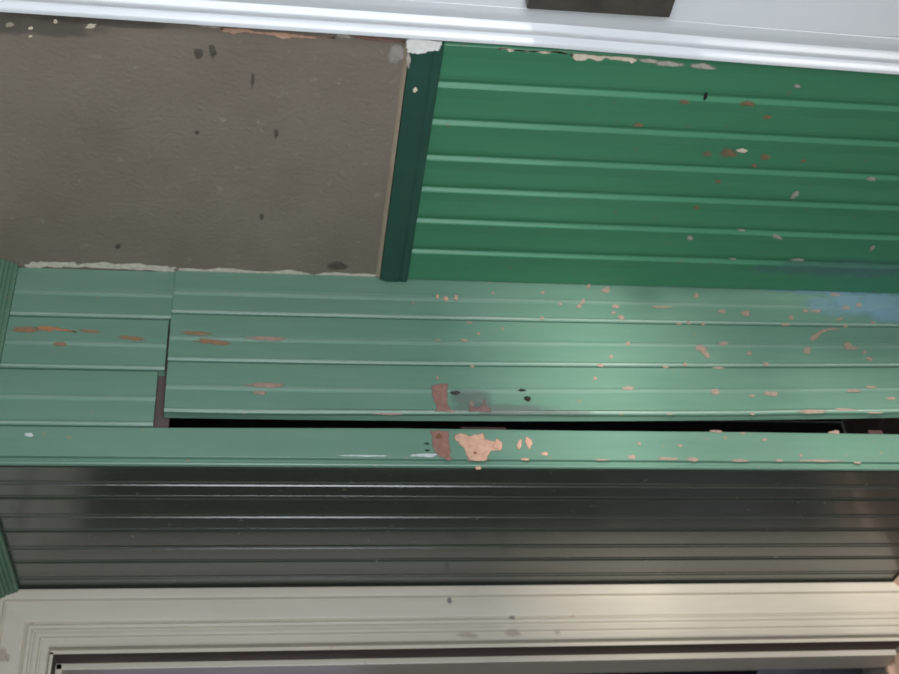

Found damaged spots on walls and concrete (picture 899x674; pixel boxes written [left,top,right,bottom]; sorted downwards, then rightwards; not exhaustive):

peeling [497,48,714,69]
peeling [722,148,748,156]
peeling [185,331,227,345]
peeling [432,376,455,413]
peeling [431,430,502,470]